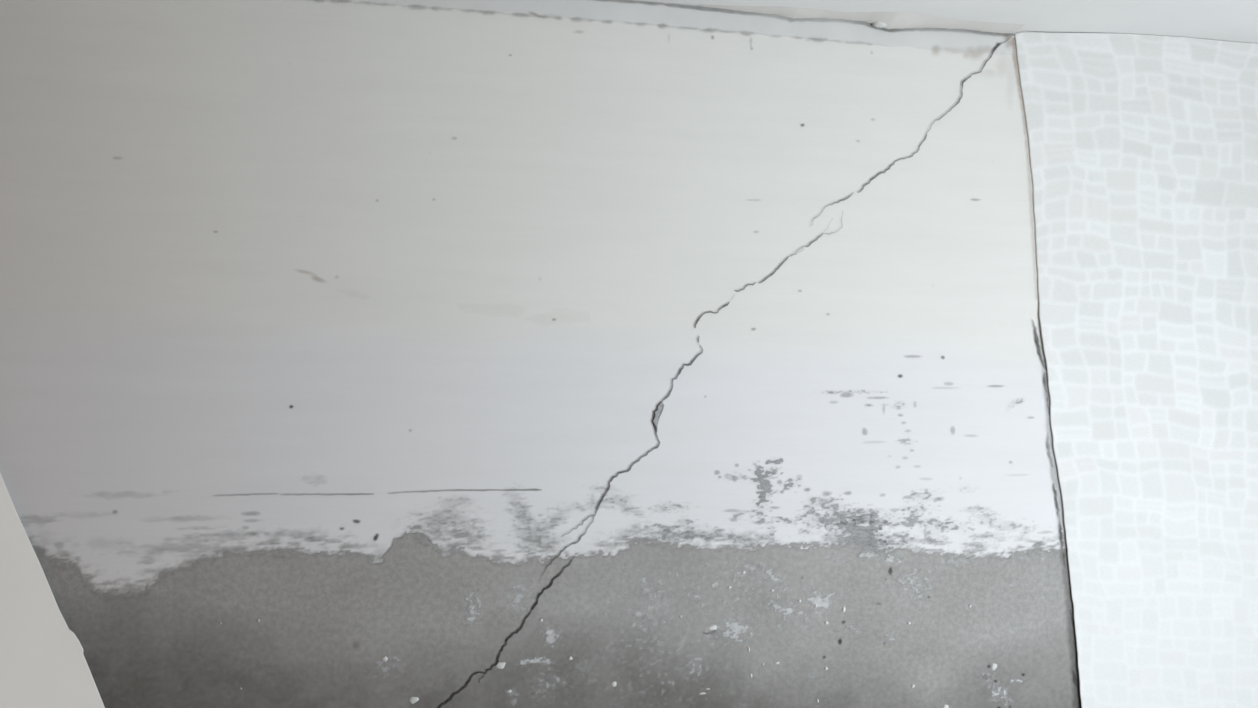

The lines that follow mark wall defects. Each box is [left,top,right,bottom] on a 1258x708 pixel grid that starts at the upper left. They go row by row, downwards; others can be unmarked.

crack [833,43,1001,204]
crack [1034,326,1048,391]
crack [438,235,822,708]
crack [1053,489,1063,544]
damp [88,663,321,708]
damp [415,696,458,708]